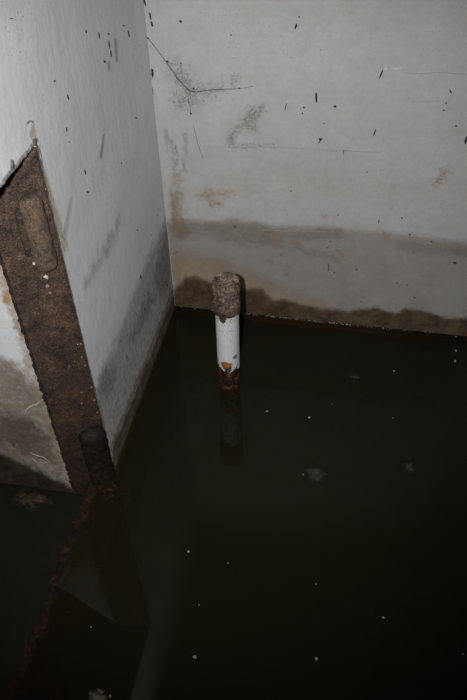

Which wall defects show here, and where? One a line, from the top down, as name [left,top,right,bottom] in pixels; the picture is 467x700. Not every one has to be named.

crack [149,39,253,157]
leakage [101,222,467,470]